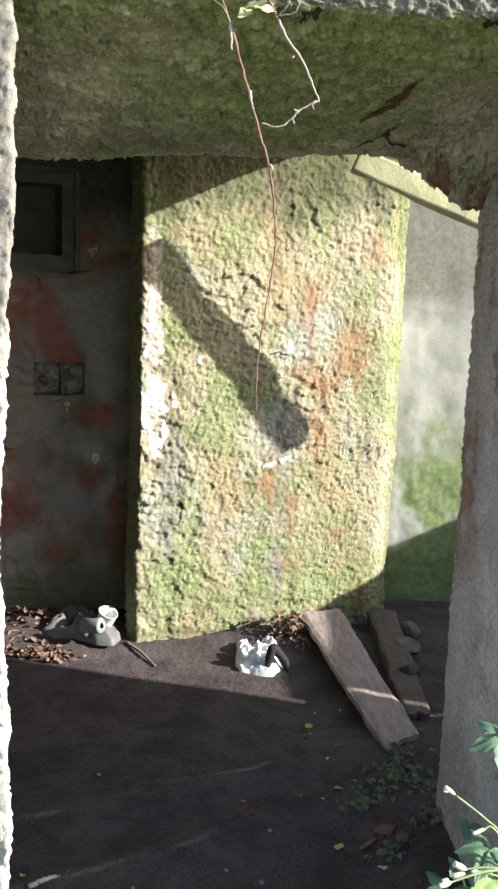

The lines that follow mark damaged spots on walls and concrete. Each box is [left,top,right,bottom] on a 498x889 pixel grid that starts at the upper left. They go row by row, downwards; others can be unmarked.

spalling [397,149,494,211]
peeling [141,294,178,458]